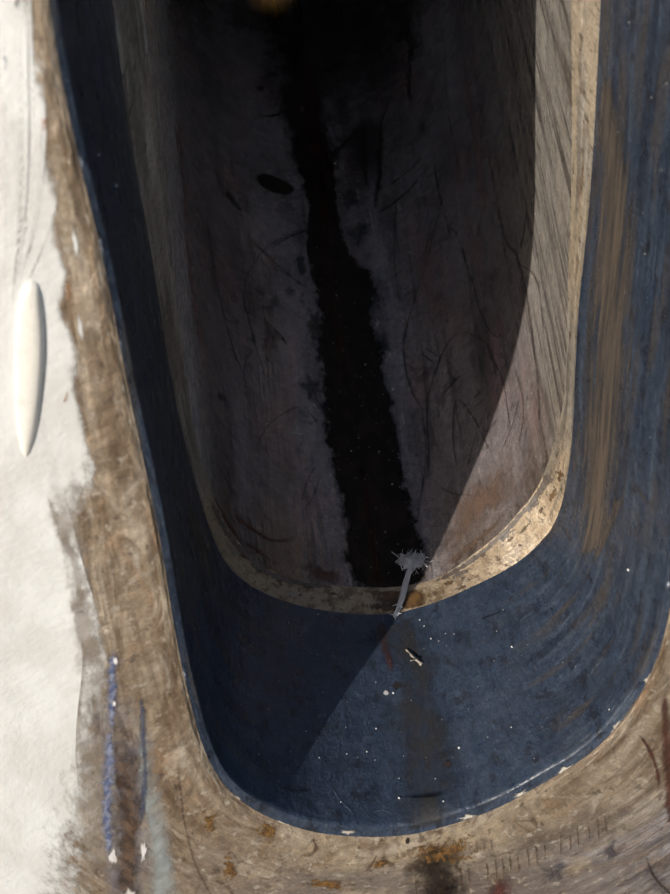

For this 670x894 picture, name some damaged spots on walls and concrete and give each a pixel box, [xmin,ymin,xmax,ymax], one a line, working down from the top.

peeling [0,0,106,894]
water stain [258,102,424,587]
corrosion [641,698,670,822]
crack [647,866,670,893]